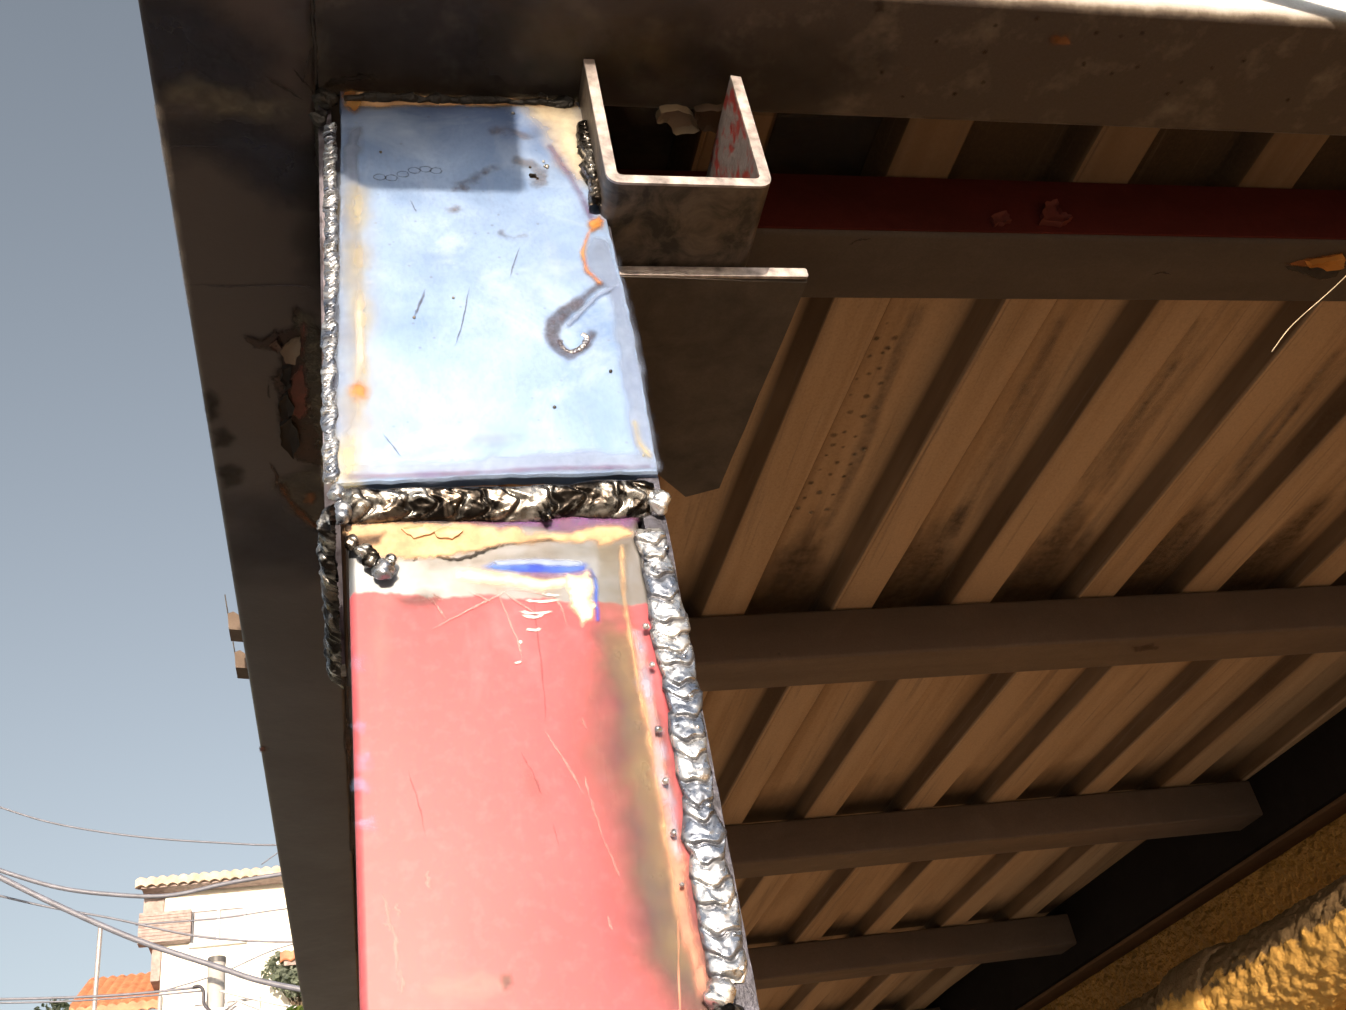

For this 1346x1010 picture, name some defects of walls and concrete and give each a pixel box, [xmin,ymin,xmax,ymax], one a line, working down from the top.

peeling [244,307,323,467]